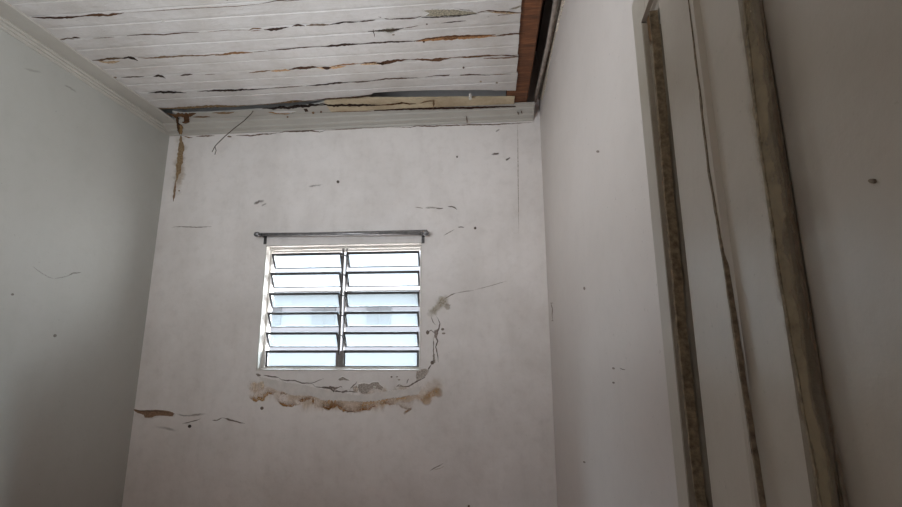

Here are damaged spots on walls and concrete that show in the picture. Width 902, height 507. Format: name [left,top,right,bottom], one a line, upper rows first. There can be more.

peeling [33,0,298,22]
peeling [250,6,521,31]
crack [396,282,502,387]
spalling [134,408,176,419]
damp [279,393,391,412]